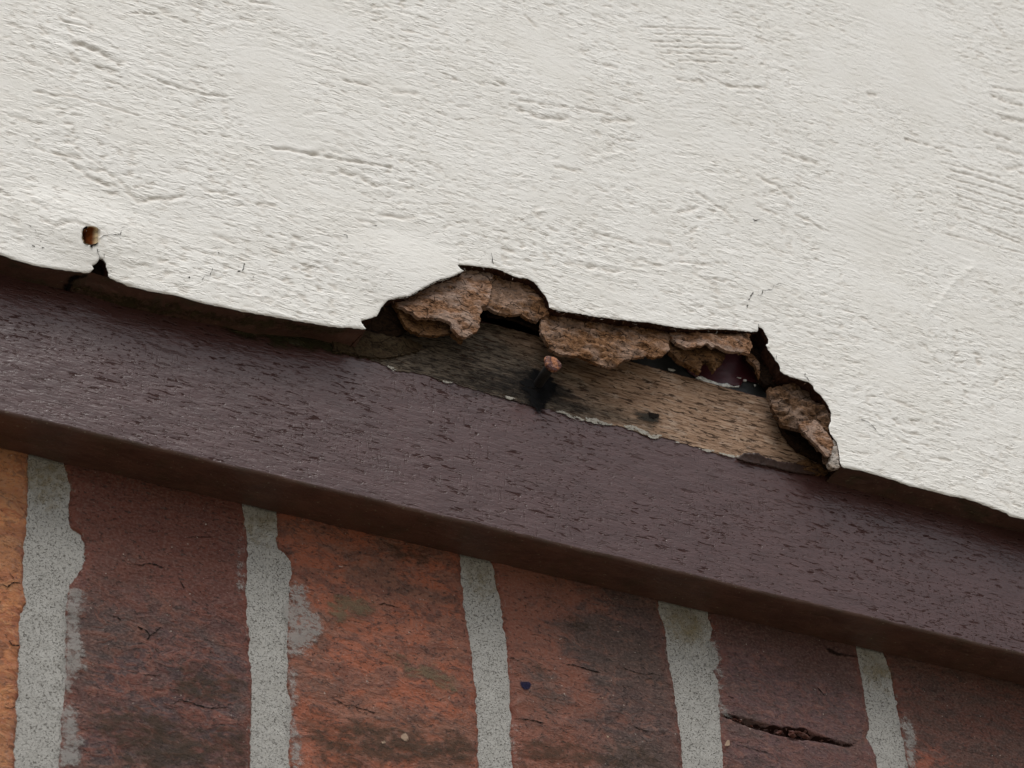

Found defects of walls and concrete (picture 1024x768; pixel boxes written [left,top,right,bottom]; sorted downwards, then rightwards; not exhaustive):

rust [82,226,99,247]
spalling [331,265,843,477]
crack [724,696,854,755]